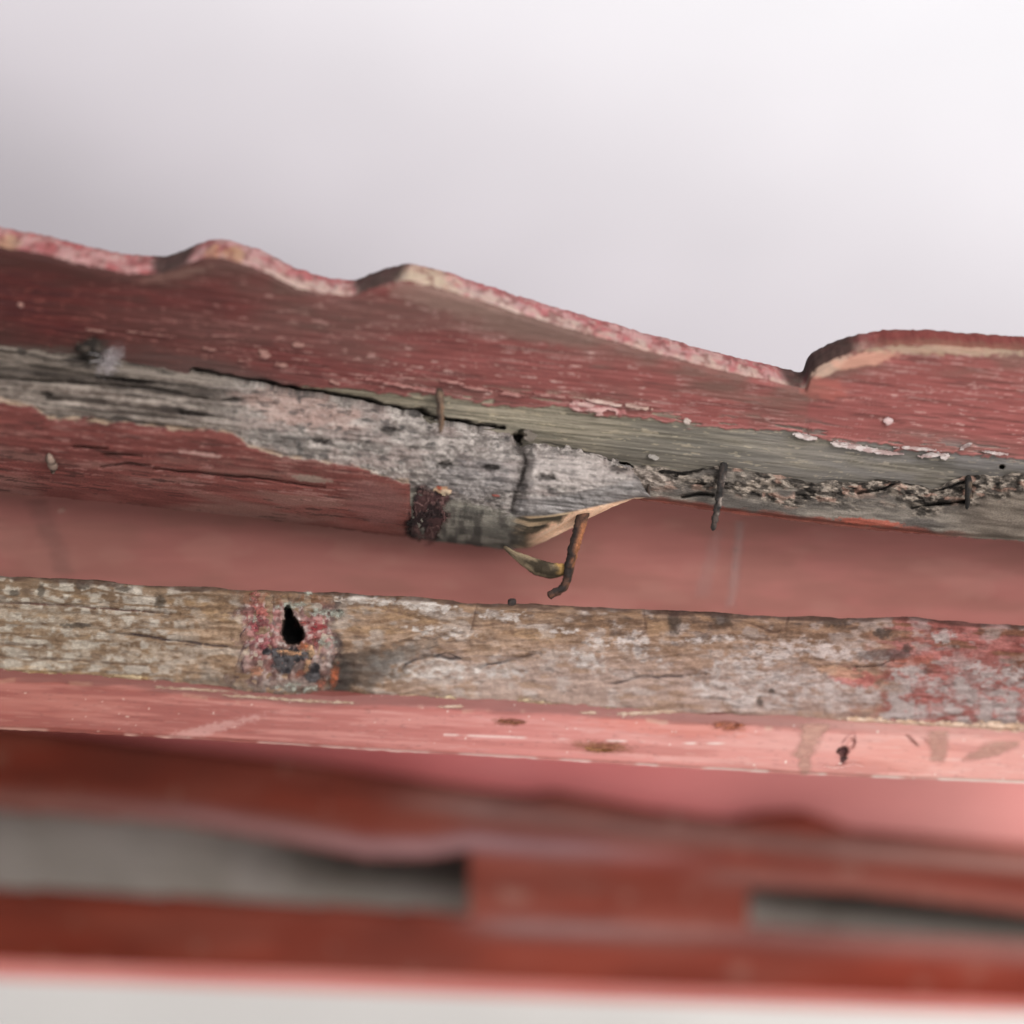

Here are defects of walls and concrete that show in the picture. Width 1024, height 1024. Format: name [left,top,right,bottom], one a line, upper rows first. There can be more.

peeling [238,349,289,367]
peeling [361,378,653,416]
peeling [792,432,817,441]
peeling [830,440,1008,461]
crack [513,442,590,503]
peeling [433,486,452,496]
spalling [105,591,353,704]
spalling [581,707,677,716]